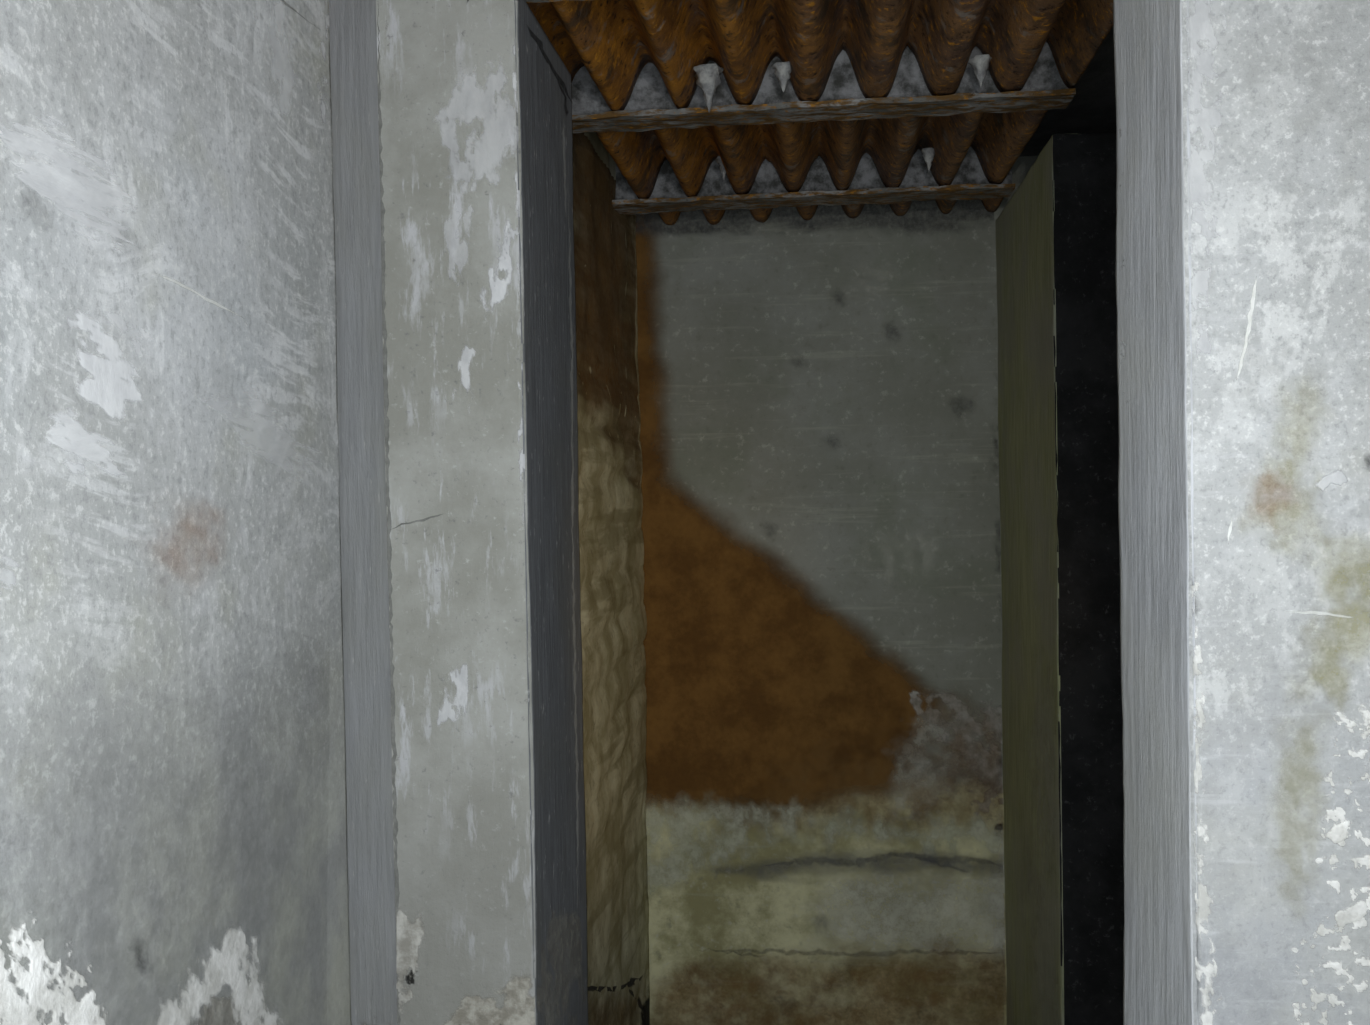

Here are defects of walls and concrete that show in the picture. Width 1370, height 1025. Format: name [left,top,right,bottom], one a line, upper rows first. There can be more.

corrosion [573,133,935,810]
damp [1290,564,1370,681]
damp [646,807,770,892]
spalling [197,995,243,1025]
spalling [444,976,535,1025]